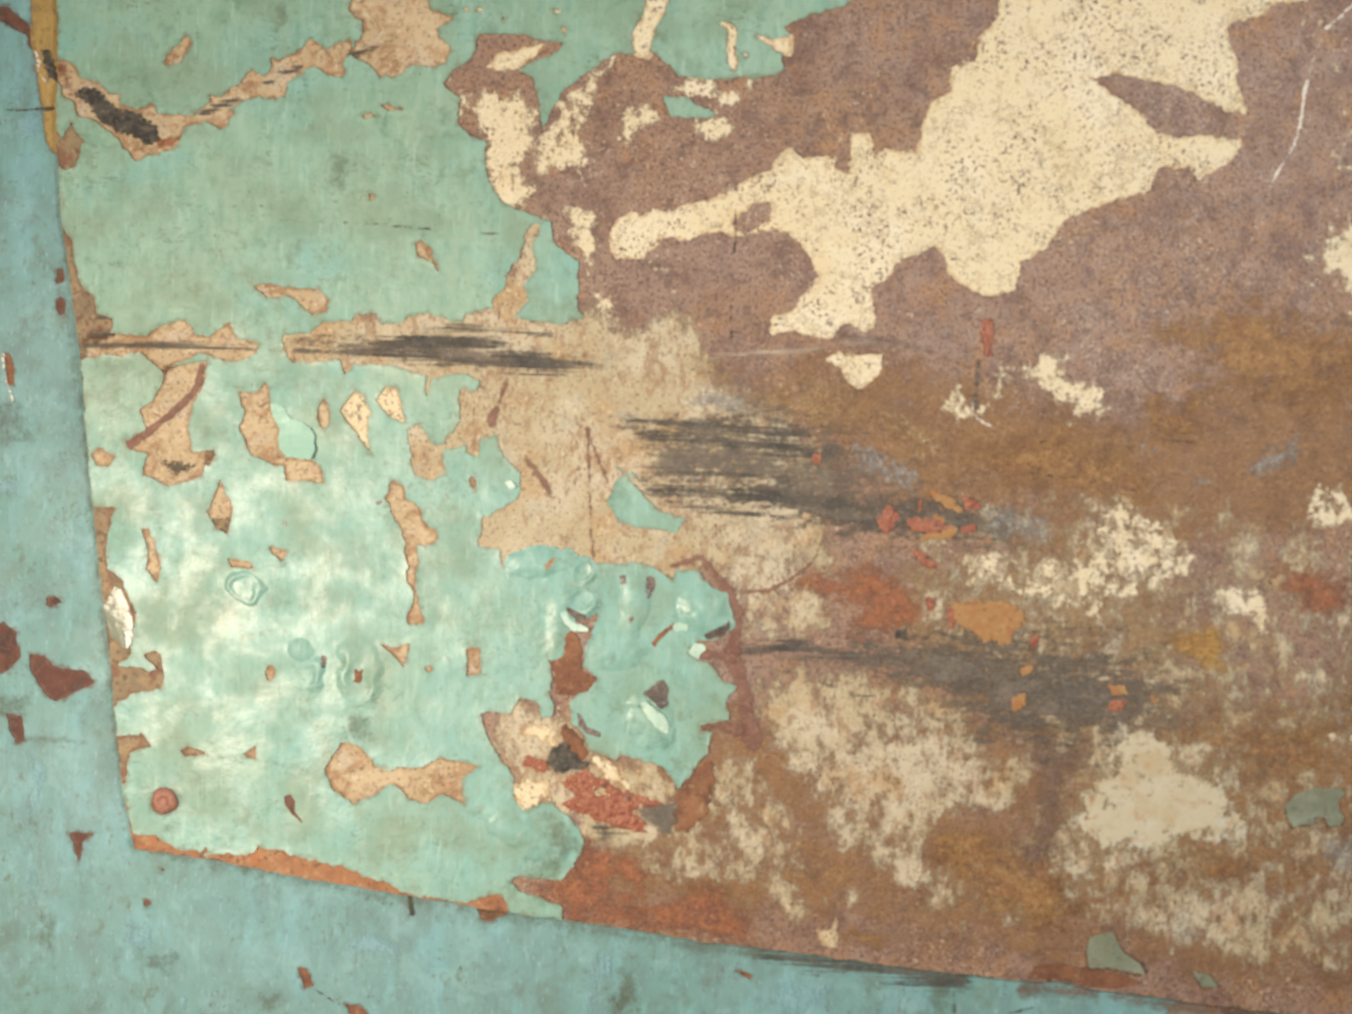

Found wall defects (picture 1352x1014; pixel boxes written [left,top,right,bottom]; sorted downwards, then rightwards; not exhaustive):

peeling [562,0,1308,389]
peeling [80,320,258,486]
water stain [293,324,557,368]
peeling [239,55,846,640]
water stain [622,393,843,458]
water stain [641,471,1046,539]
rust [444,0,1352,1014]
rust [284,794,302,823]
rust [126,806,509,921]
peeling [491,701,809,923]
peeling [754,484,1352,979]
rust [298,967,314,988]